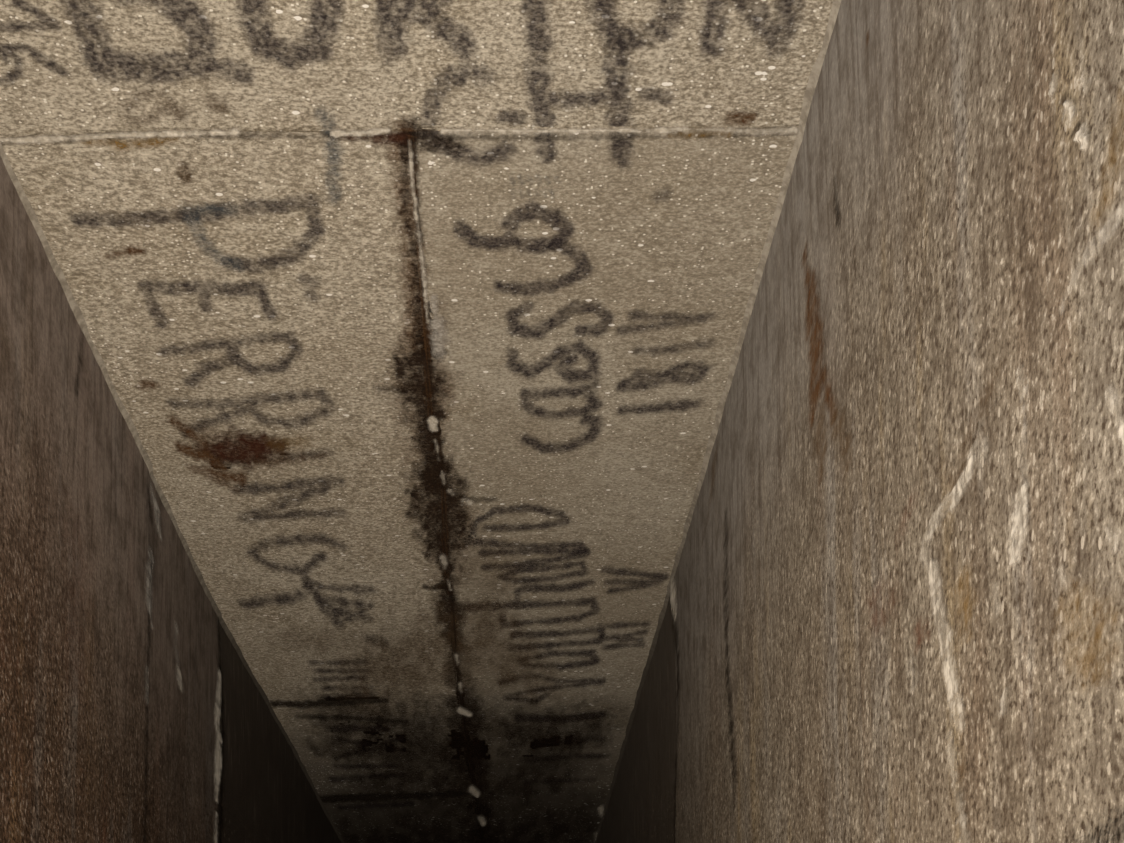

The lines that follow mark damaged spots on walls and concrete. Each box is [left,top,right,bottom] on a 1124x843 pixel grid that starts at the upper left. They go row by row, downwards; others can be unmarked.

crack [0,129,239,143]
crack [441,126,797,134]
crack [331,129,443,485]
rust [170,418,300,485]
damp [339,121,591,843]
crack [423,501,472,604]
crack [320,633,486,839]